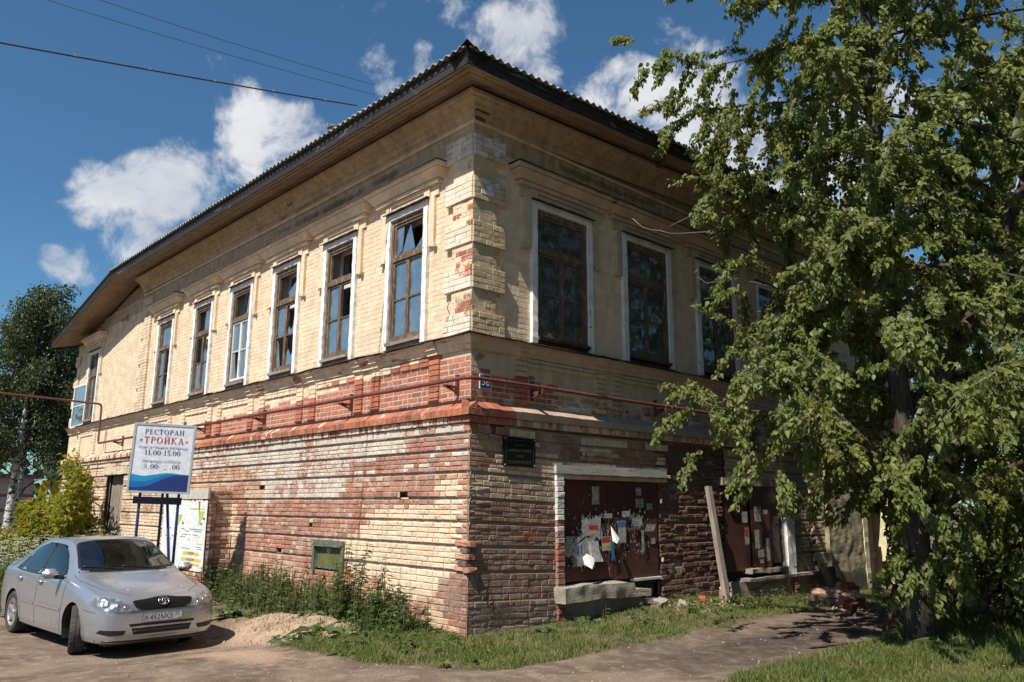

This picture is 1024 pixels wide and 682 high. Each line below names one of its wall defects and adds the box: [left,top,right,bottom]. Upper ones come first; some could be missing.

peeling [474,108,506,160]
peeling [453,177,500,226]
peeling [454,247,475,279]
peeling [455,293,472,317]
peeling [196,355,558,439]
peeling [234,422,510,573]